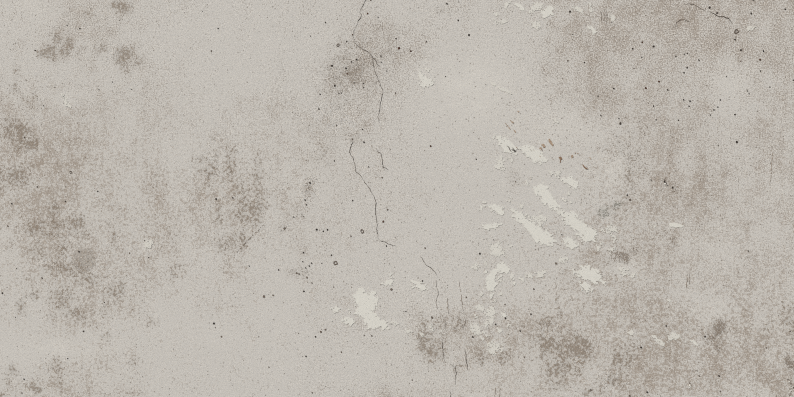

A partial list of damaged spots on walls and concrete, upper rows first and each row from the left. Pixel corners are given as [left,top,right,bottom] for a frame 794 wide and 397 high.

crack [349,142,395,246]
peeling [478,134,619,296]
peeling [331,273,394,331]
peeling [470,241,547,355]